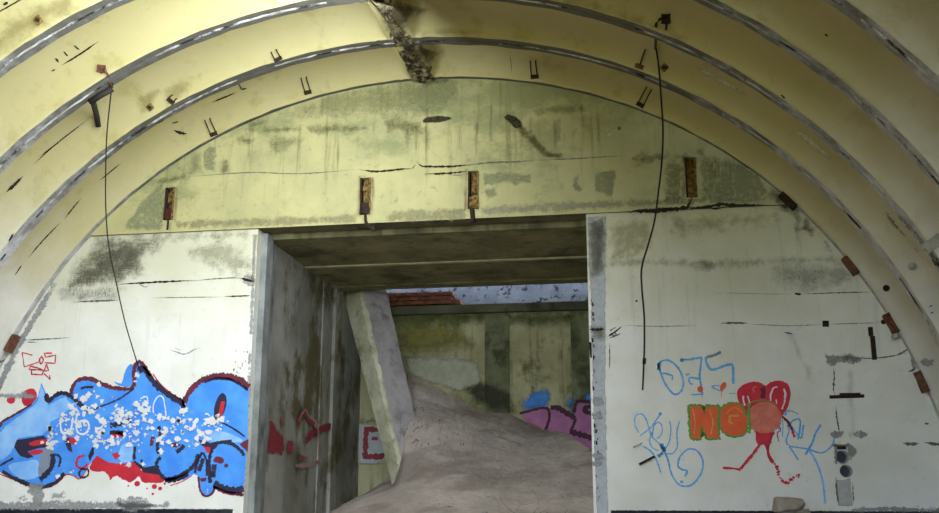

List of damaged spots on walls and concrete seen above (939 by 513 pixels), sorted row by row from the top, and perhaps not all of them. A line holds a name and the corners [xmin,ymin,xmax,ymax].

crack [189,156,616,177]
crack [626,197,763,213]
damp [70,237,152,286]